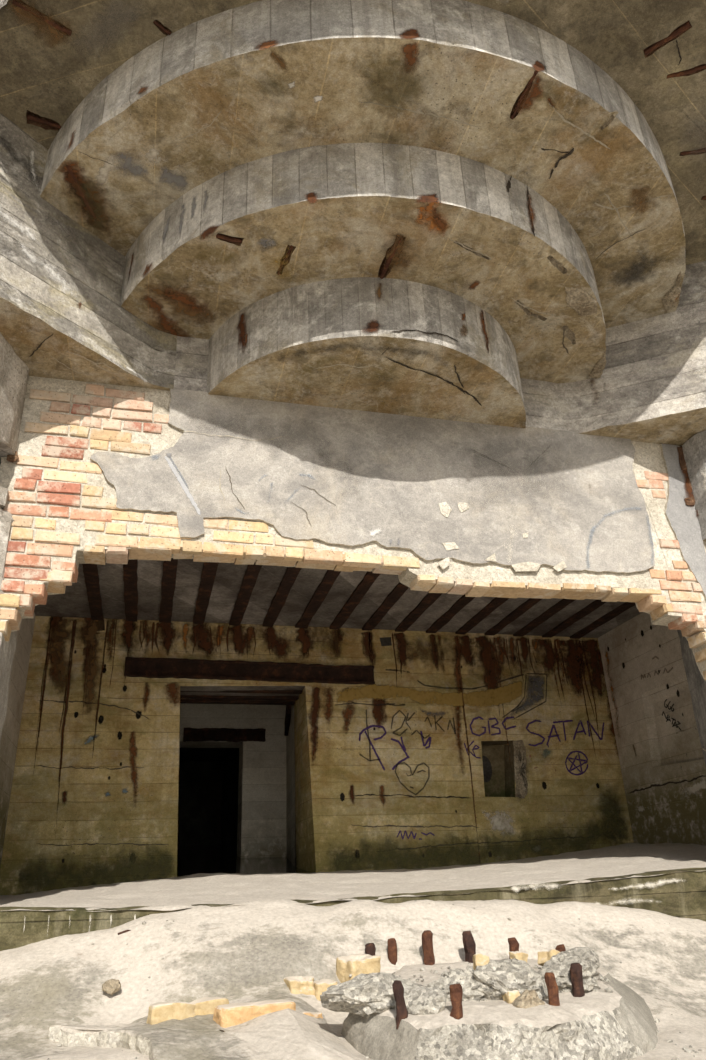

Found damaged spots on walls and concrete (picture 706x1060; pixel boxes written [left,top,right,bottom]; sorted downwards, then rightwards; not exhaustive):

rust [12,0,72,46]
rust [644,21,691,55]
rust [510,61,554,120]
rust [27,115,74,148]
rust [59,162,109,231]
rust [376,234,408,299]
crack [480,311,489,353]
crack [313,330,482,406]
flaking render [0,384,420,622]
flaking render [633,446,706,629]